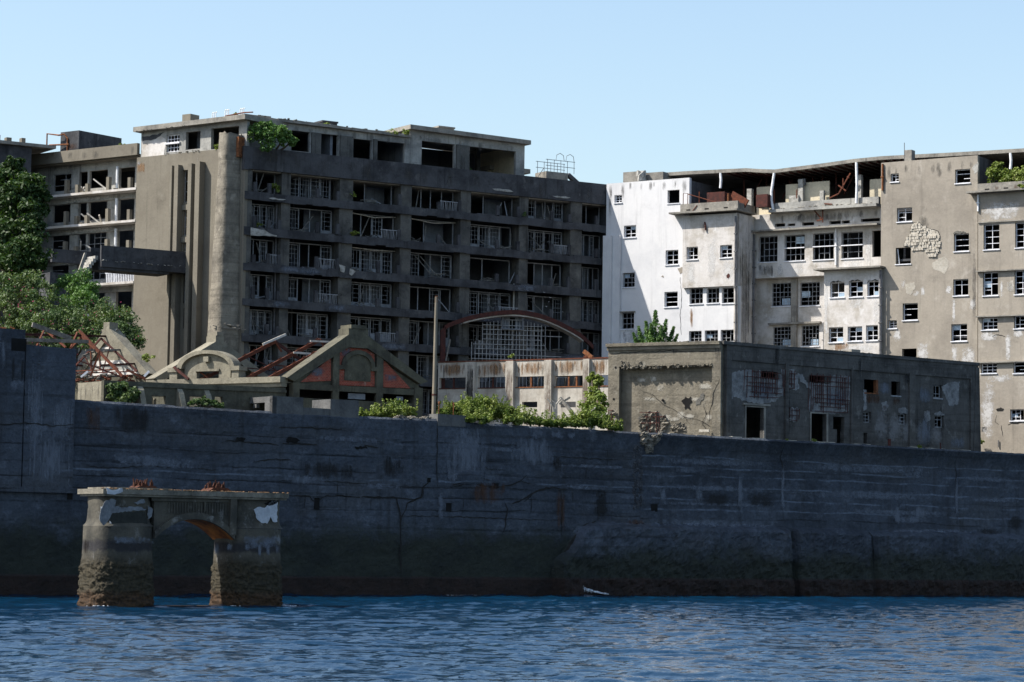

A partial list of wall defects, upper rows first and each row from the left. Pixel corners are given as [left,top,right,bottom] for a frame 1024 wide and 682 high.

spalling [903,221,948,274]
spalling [924,381,960,422]
spalling [620,360,850,509]
peeling [100,488,153,526]
rust [184,519,233,540]
peeling [254,500,278,523]
crack [228,422,632,574]